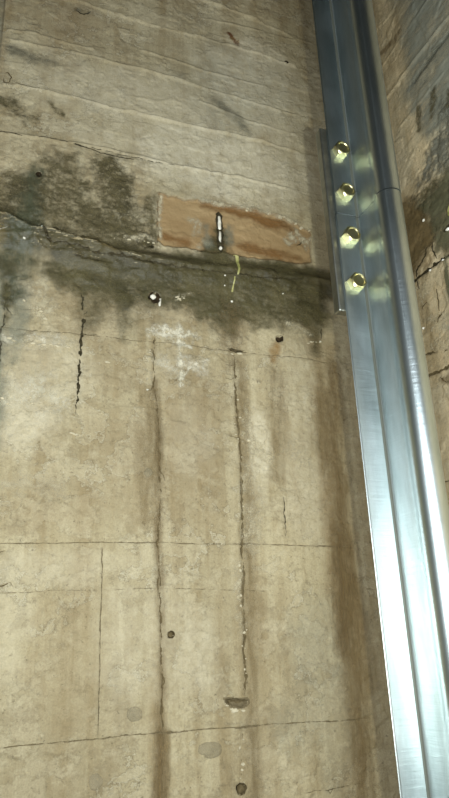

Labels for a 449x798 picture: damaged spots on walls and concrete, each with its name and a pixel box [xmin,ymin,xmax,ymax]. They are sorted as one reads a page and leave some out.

water stain [0,155,157,250]
crack [30,224,302,280]
water stain [27,227,330,349]
water stain [403,170,449,295]
crack [414,242,449,319]
crack [0,294,363,790]
spalling [223,697,250,713]